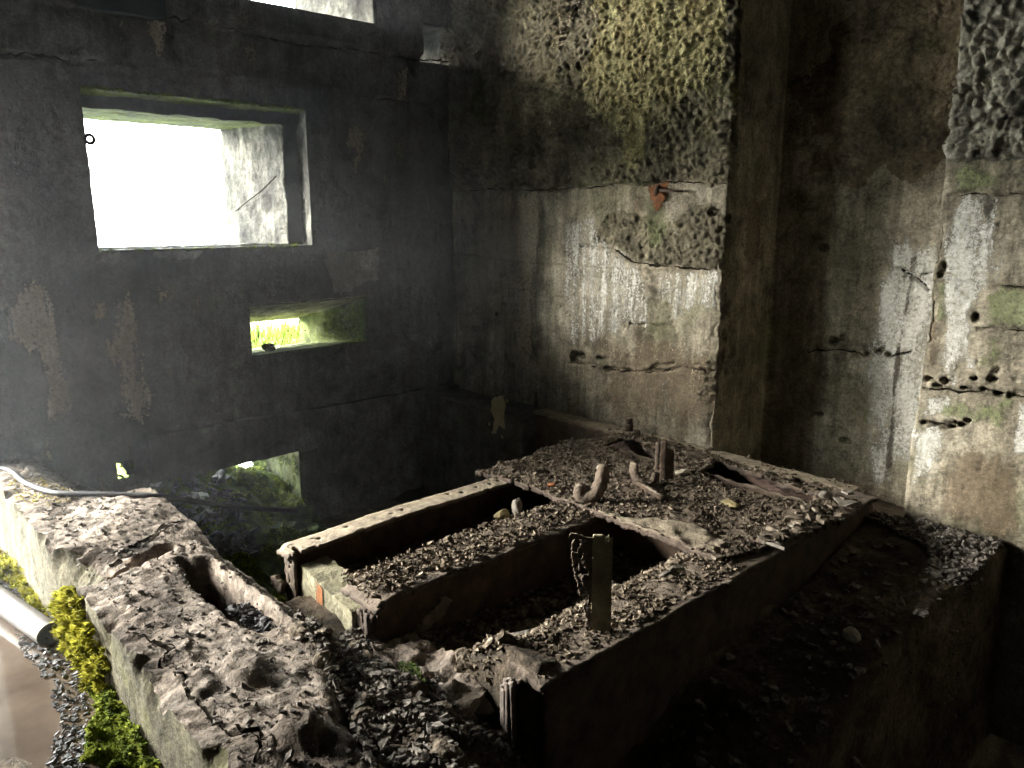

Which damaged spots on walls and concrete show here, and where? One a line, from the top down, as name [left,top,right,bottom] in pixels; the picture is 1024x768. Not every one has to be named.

crack [466,180,727,191]
crack [580,246,721,270]
crack [898,267,930,290]
spalling [569,350,636,372]
crack [808,349,911,358]
damp [865,194,1024,538]
spalling [925,374,1017,398]